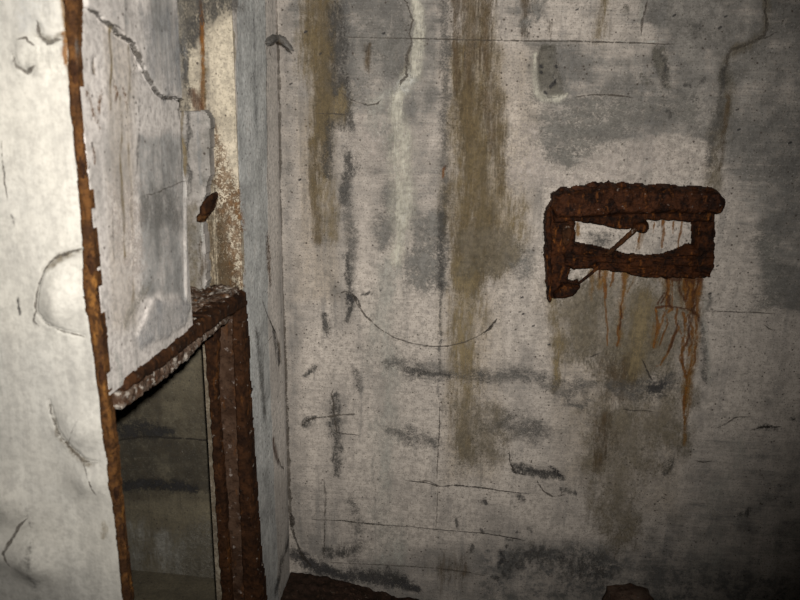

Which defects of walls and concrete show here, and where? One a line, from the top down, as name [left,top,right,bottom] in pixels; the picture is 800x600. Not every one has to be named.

crack [87,8,184,195]
rust [208,134,244,290]
crack [265,0,282,244]
leakage [300,0,355,244]
leakage [344,225,357,322]
crack [263,287,529,566]
leakage [365,0,695,484]
rust [558,181,641,192]
rust [590,270,630,346]
rust [653,220,683,248]
rust [653,277,703,444]
crack [726,0,768,63]